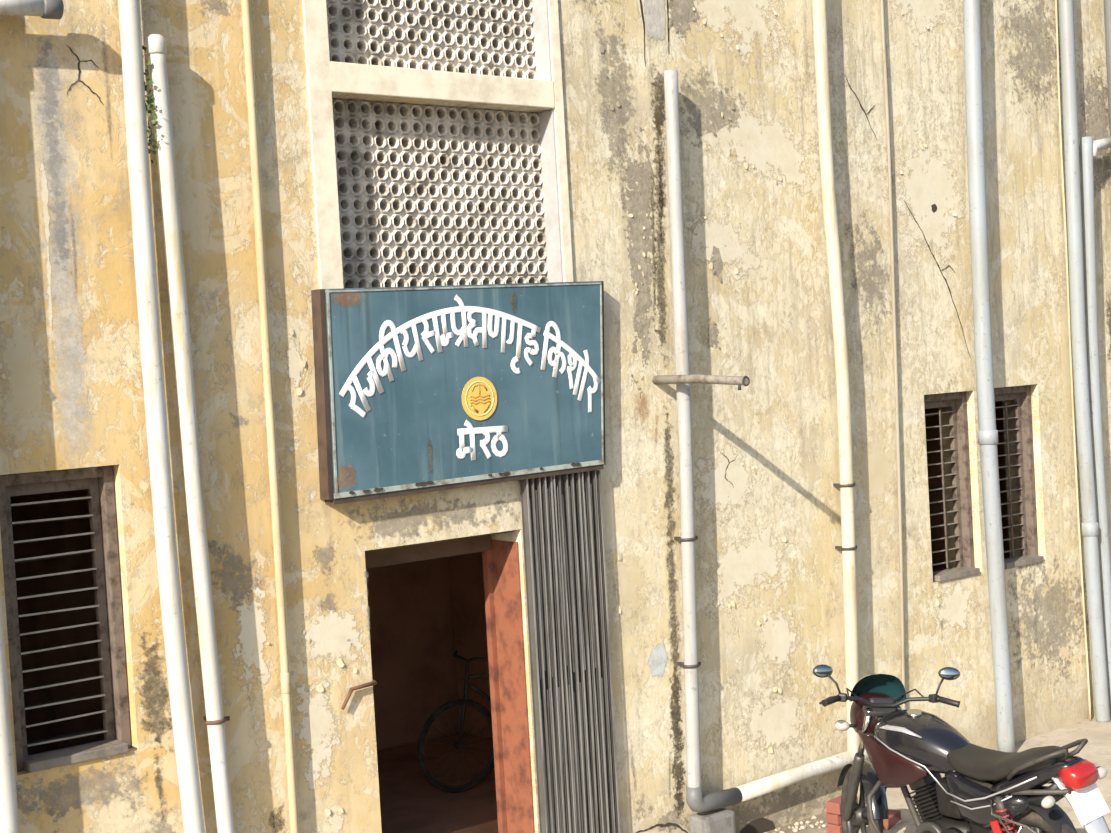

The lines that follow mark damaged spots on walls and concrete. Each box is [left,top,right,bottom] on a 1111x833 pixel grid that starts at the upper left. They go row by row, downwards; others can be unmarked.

crack [67,45,103,104]
water stain [680,68,745,146]
water stain [36,38,89,448]
water stain [650,65,667,359]
peeling [233,574,271,699]
peeling [301,596,367,674]
water stain [664,408,690,830]
water stain [16,636,174,833]
peeling [296,677,341,790]
water stain [732,774,839,833]